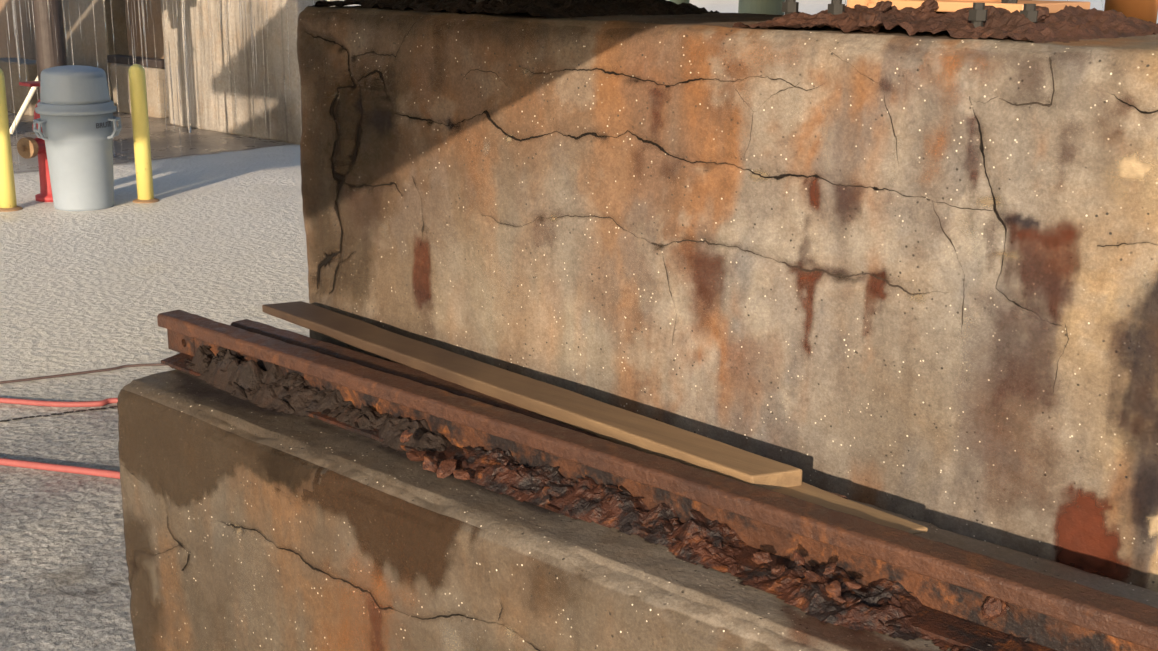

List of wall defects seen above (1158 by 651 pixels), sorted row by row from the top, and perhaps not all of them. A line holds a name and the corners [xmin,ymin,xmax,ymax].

crack [1108,92,1158,114]
crack [306,22,1069,394]
rust [413,240,431,307]
rust [791,264,822,353]
rust [868,270,886,299]
rust [1008,215,1078,318]
water stain [1123,282,1158,525]
crack [124,466,190,580]
water stain [0,389,480,590]
rust [1054,486,1129,582]
crack [218,521,540,651]